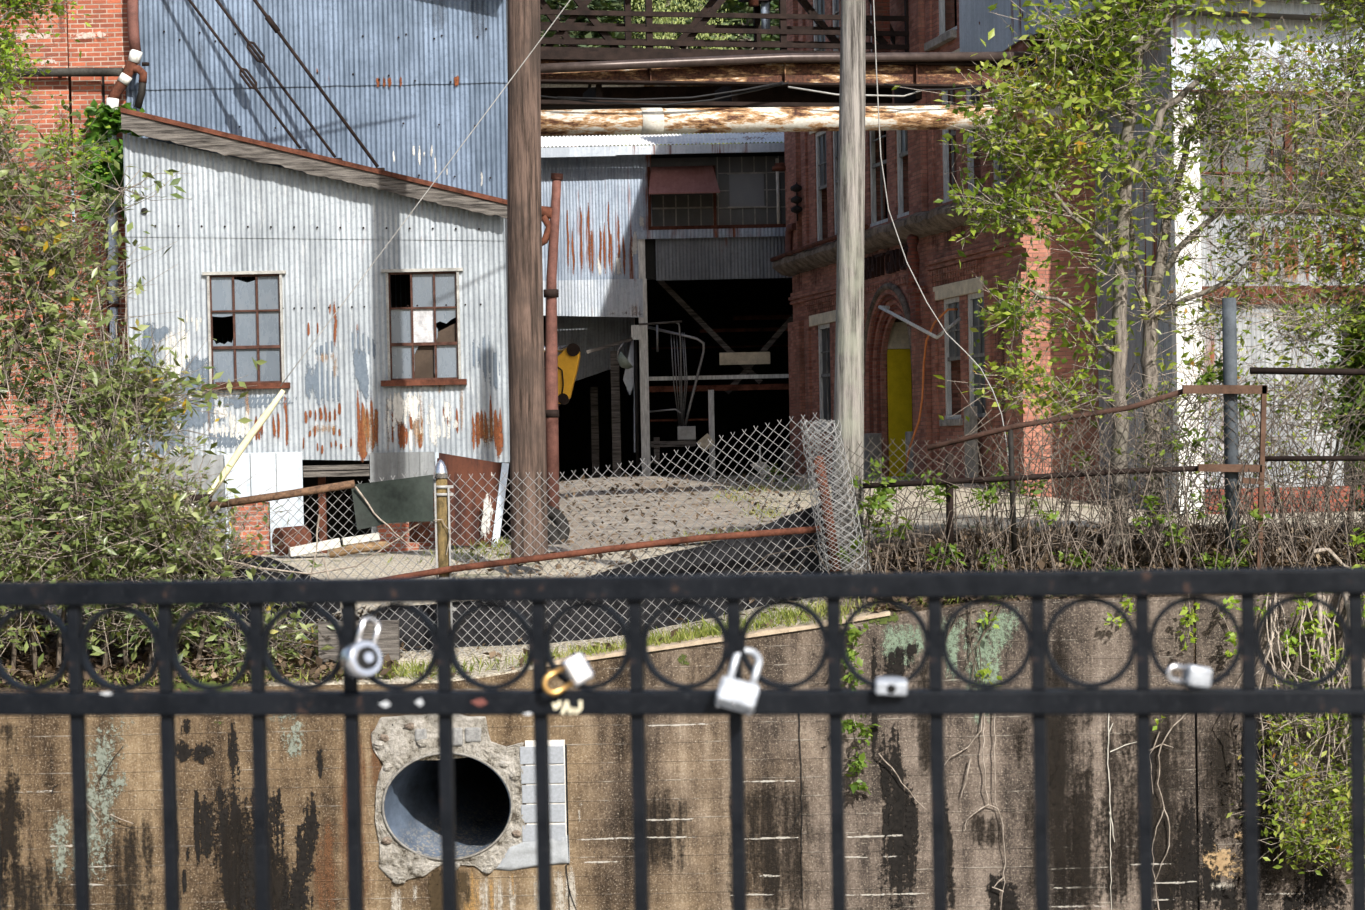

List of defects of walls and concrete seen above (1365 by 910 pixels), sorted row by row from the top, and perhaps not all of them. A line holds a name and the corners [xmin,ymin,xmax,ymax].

rust [566,202,633,275]
rust [307,302,337,375]
rust [235,386,423,462]
rust [443,396,503,459]
damp [871,632,929,689]
damp [0,725,74,910]
damp [176,718,320,910]
spalling [371,698,526,884]
damp [621,790,688,871]
damp [728,775,813,910]
damp [871,715,930,910]
damp [971,715,1347,910]